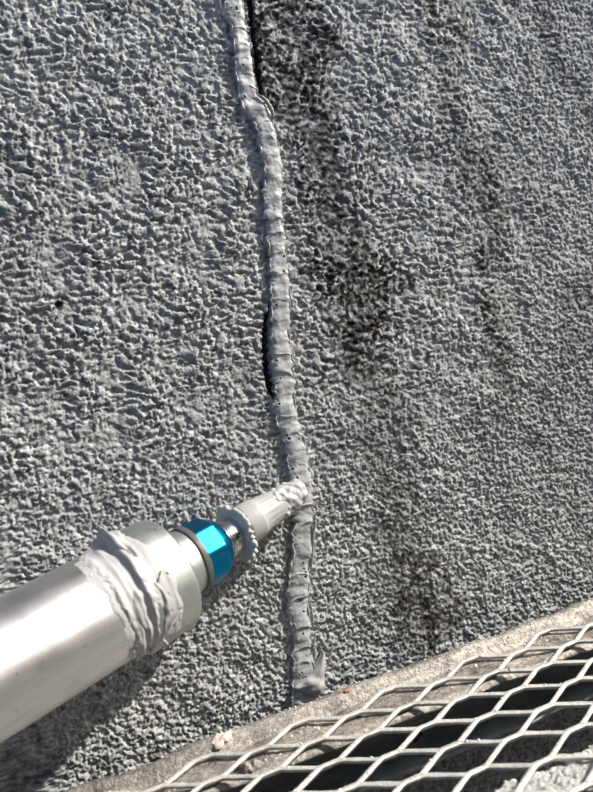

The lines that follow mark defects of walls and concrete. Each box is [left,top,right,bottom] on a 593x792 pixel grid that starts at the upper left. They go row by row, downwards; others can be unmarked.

crack [246,0,263,99]
damp [243,0,348,171]
damp [306,190,343,219]
damp [300,226,414,370]
crack [261,317,273,395]
damp [391,551,464,651]